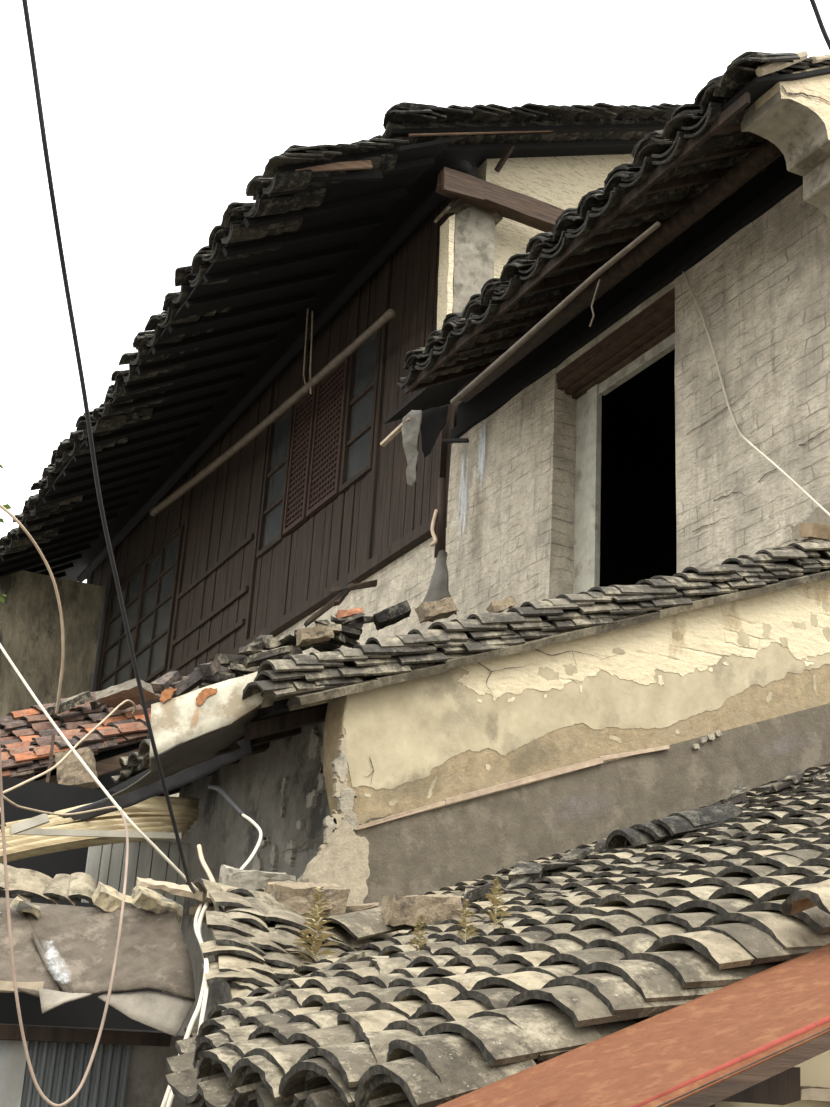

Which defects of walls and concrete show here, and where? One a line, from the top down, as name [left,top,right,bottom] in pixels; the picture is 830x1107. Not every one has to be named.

crack [692,428,829,532]
flaking render [251,578,830,882]